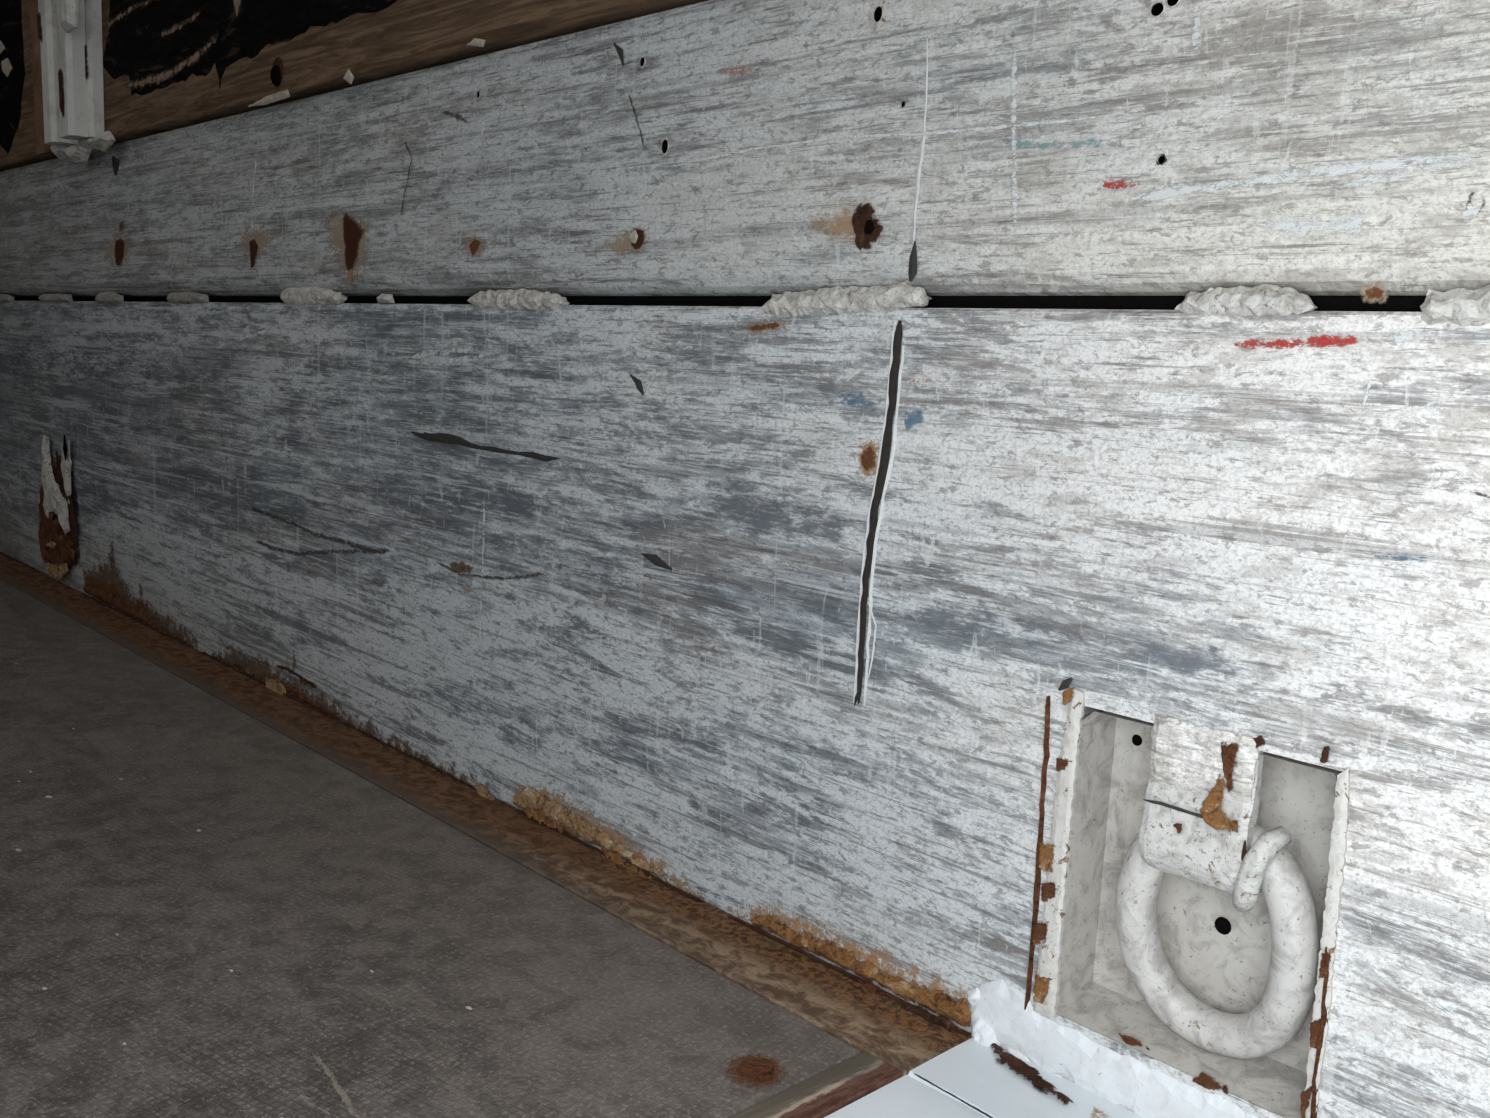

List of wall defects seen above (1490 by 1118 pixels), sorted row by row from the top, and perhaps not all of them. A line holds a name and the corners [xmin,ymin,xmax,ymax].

peeling [0,0,42,154]
peeling [84,0,397,96]
crack [908,38,928,282]
rust [325,210,370,283]
rust [812,200,883,251]
peeling [46,541,68,581]
crack [853,320,904,707]
rust [1024,696,1050,1010]
rust [991,1043,1073,1104]